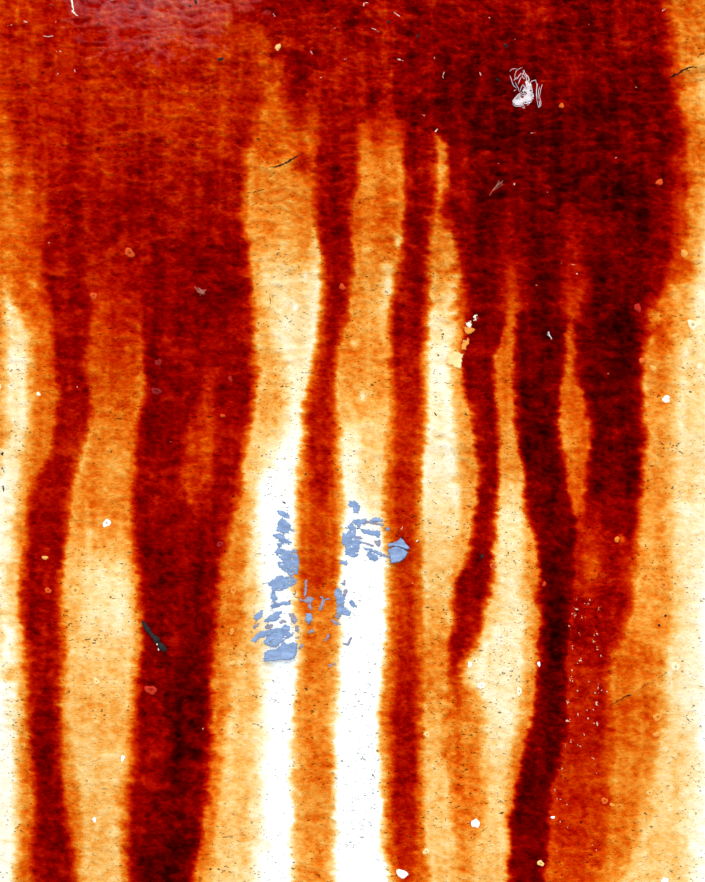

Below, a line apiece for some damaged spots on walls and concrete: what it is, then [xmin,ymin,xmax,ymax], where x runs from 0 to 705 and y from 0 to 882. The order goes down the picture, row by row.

corrosion [191,240,253,305]
peeling [251,510,356,661]
peeling [339,500,411,565]
corrosion [493,265,579,882]
corrosion [544,597,663,882]